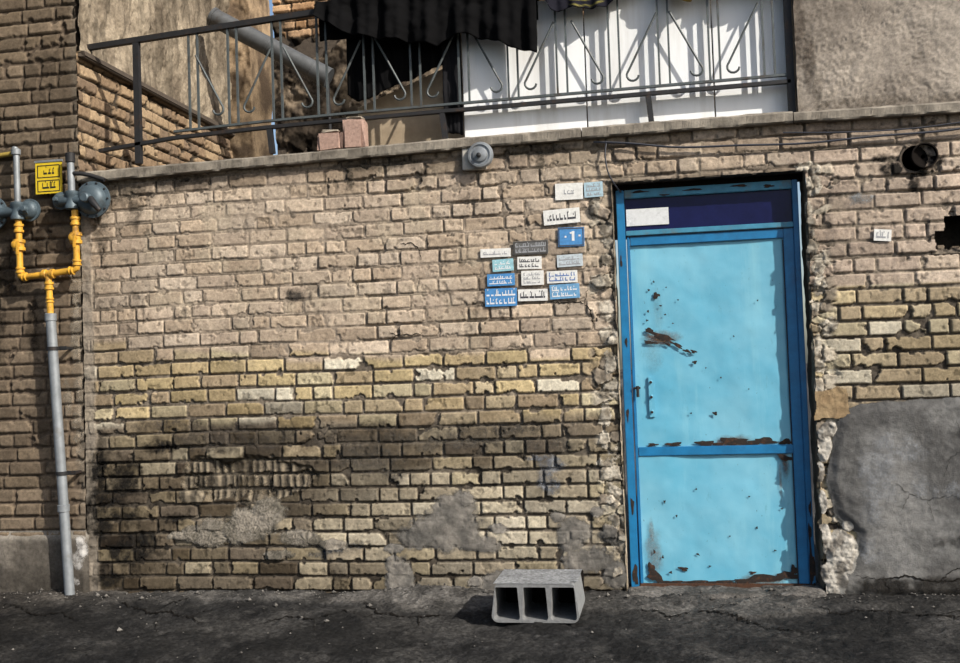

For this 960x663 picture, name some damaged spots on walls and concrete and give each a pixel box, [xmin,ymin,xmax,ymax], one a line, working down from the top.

spalling [930,211,960,255]
leakage [70,262,80,360]
spalling [588,197,634,554]
peeling [795,161,860,594]
leakage [63,379,85,453]
leakage [86,449,156,587]
leakage [145,418,288,453]
spalling [179,456,313,508]
rust [647,562,798,584]
rust [694,437,792,483]
rust [808,501,816,585]
crack [894,452,960,519]